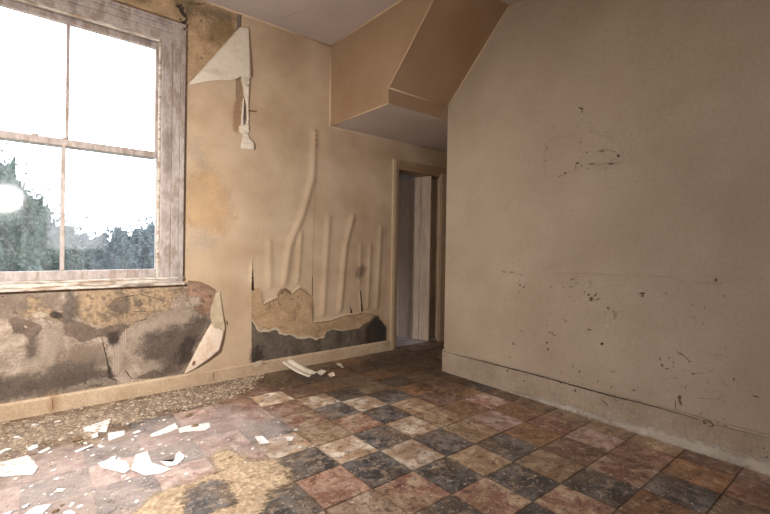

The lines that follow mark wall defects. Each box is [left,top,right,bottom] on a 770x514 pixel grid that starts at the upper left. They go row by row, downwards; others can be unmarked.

flaking render [112,0,237,84]
water stain [176,0,196,30]
water stain [0,290,129,401]
flaking render [0,280,216,404]
water stain [143,315,209,376]
flaking render [252,285,382,338]
water stain [510,392,770,476]